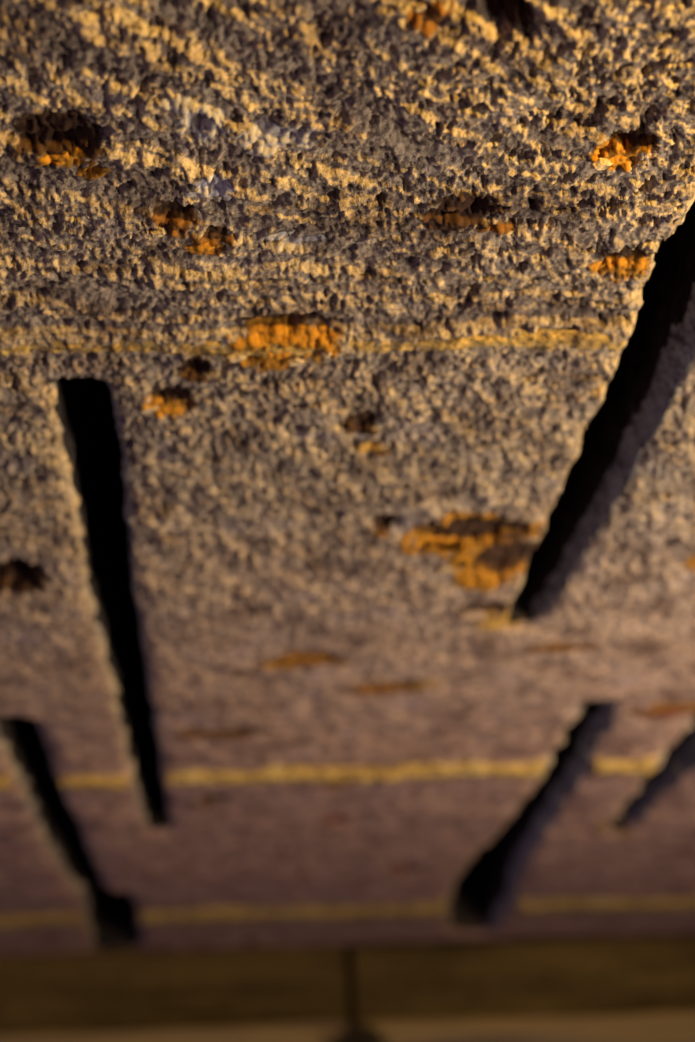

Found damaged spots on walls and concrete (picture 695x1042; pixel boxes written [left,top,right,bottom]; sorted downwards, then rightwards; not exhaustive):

rust [399,509,544,631]
rust [524,644,603,653]